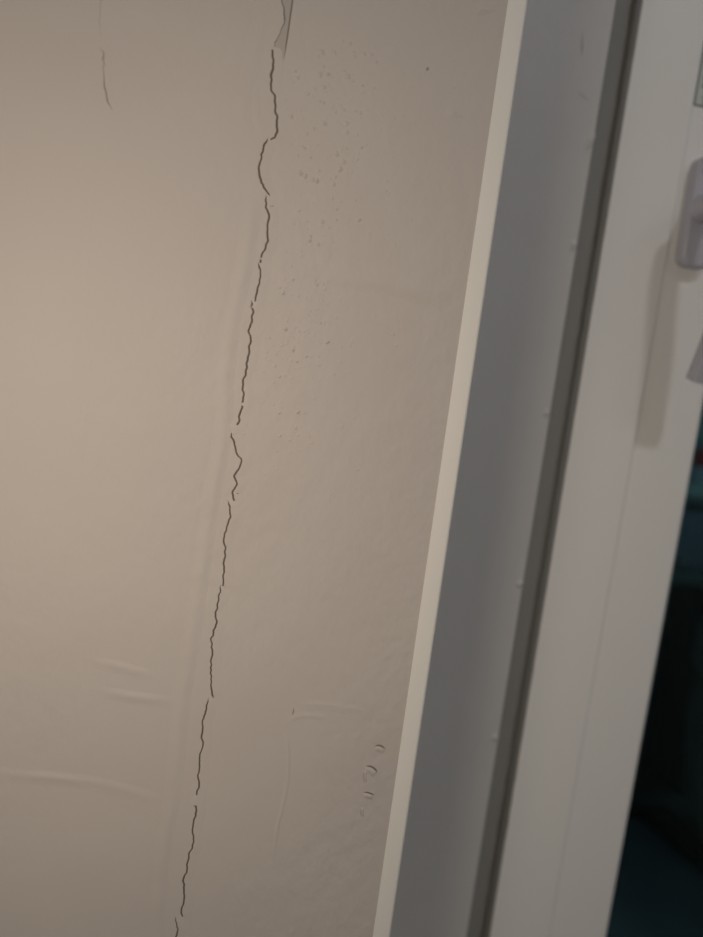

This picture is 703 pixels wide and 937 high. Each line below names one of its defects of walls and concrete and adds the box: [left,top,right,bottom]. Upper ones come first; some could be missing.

crack [175,47,287,937]